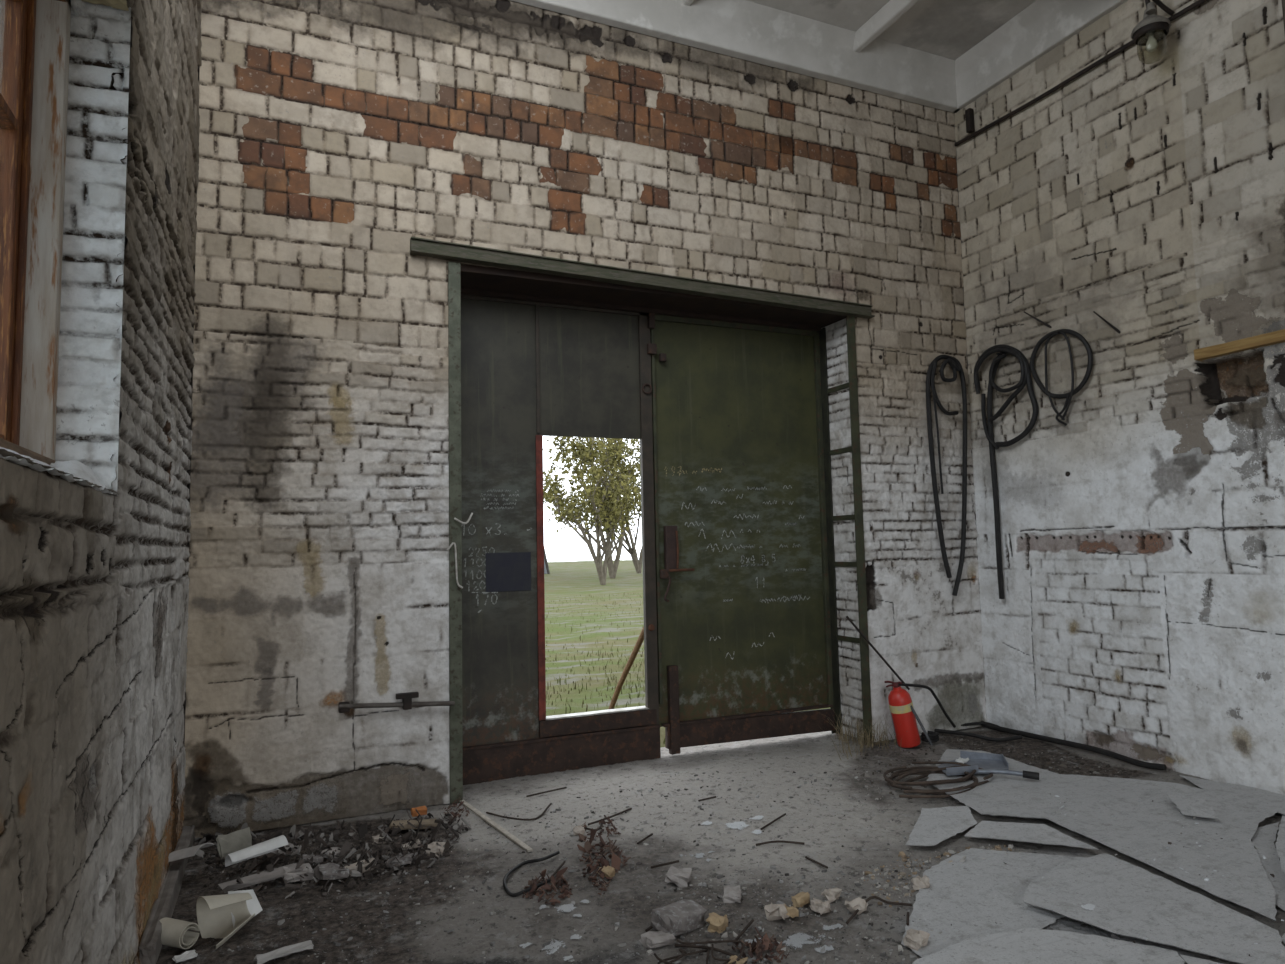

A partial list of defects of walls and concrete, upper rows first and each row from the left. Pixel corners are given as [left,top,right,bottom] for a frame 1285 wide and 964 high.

peeling [234,0,896,235]
peeling [888,143,961,239]
damp [192,322,311,505]
flaking render [1155,288,1285,504]
crack [0,660,23,890]
crack [21,671,176,956]
crack [55,588,154,697]
rust [135,764,184,963]
spalling [1094,730,1114,745]
spalling [1130,744,1163,761]